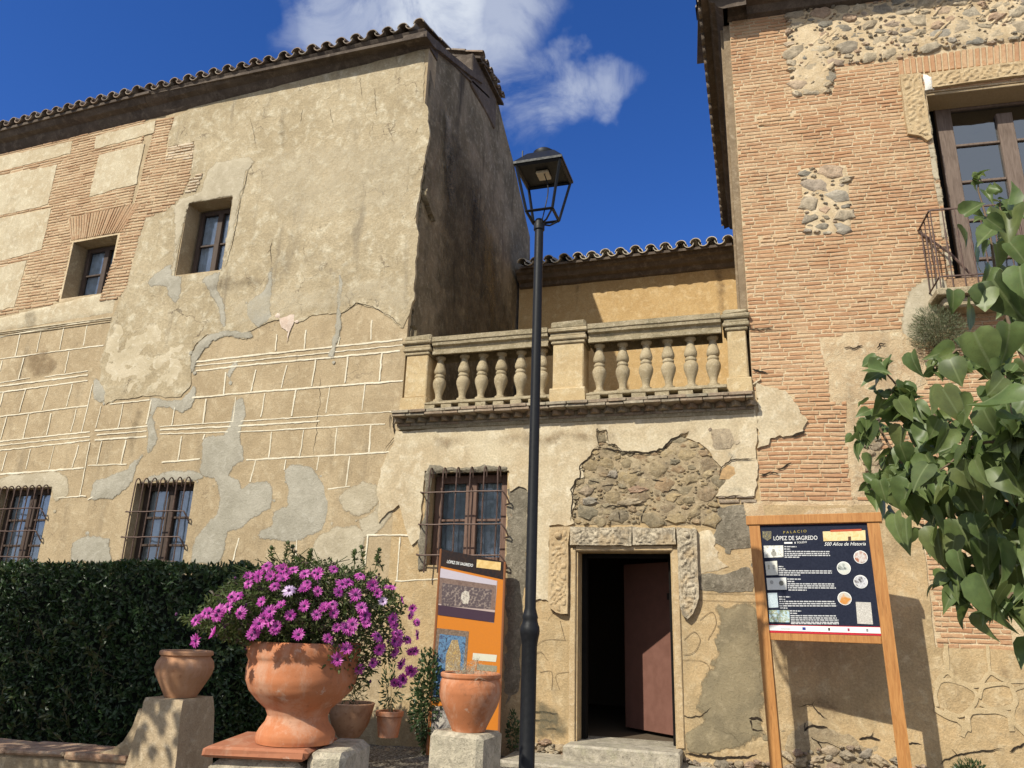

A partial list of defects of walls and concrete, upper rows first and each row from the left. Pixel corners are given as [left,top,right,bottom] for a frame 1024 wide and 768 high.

peeling [100,322,196,393]
spalling [685,563,768,754]